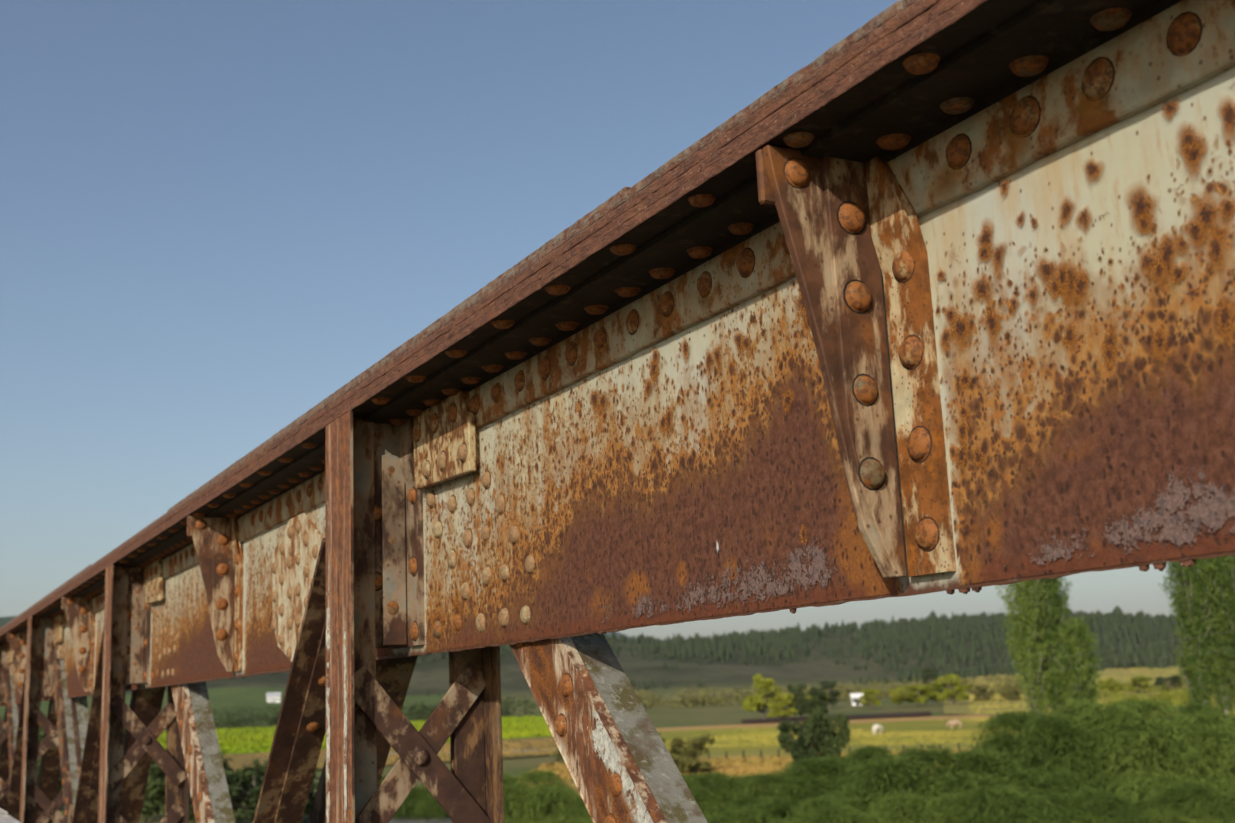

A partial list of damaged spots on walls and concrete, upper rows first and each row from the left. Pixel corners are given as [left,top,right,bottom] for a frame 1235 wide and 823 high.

rust [936,100,1235,595]
rust [125,525,292,690]
rust [423,280,901,745]
peeling [632,537,838,618]
peeling [1002,460,1235,568]
rust [596,775,632,823]